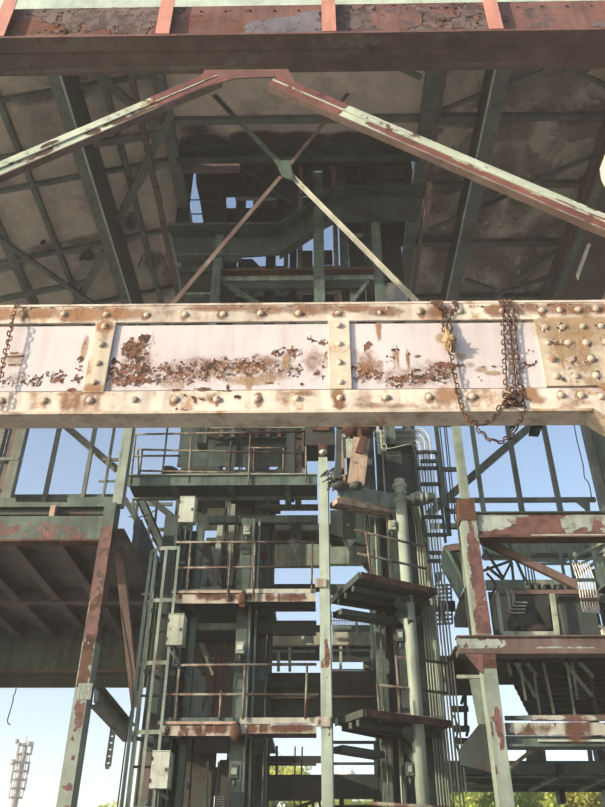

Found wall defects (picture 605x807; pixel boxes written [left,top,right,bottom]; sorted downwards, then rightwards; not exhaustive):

corrosion [0,334,329,411]
corrosion [181,304,476,405]
corrosion [469,303,605,398]
corrosion [331,389,345,409]
corrosion [98,524,113,567]
peeling [476,514,529,532]
corrosion [466,520,492,634]
corrosion [76,586,102,688]
corrosion [246,723,312,738]
corrosion [490,706,504,751]
peeling [509,723,528,734]
peeling [582,715,605,736]